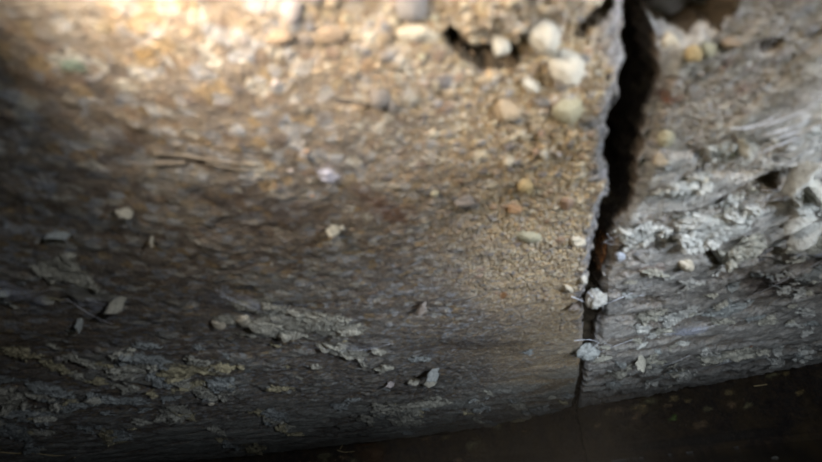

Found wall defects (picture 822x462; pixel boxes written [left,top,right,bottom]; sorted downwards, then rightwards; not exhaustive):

crack [602,116,612,158]
peeling [104,297,127,314]
peeling [213,293,394,374]
peeling [415,302,427,316]
crack [572,219,607,405]
peeling [330,356,453,435]